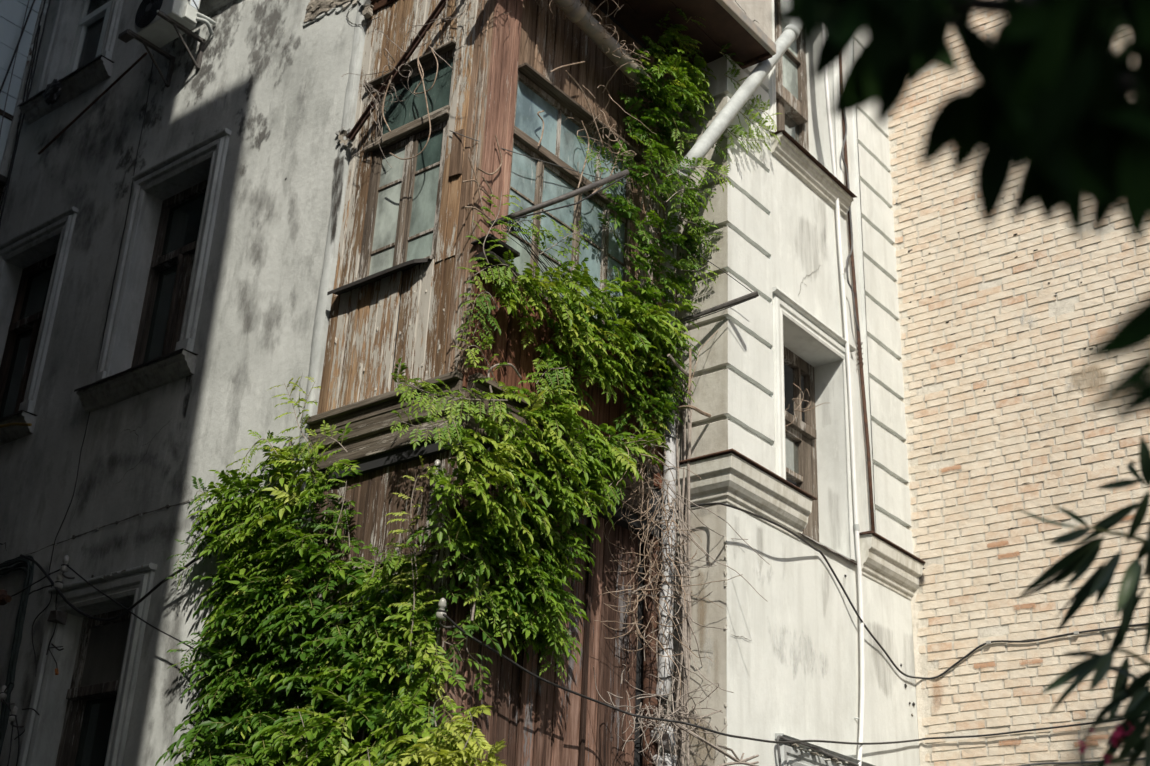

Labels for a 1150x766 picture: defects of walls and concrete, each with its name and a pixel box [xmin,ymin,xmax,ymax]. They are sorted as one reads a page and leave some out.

water stain [172,1,237,104]
water stain [246,0,301,99]
flaking render [303,0,374,27]
water stain [237,111,270,147]